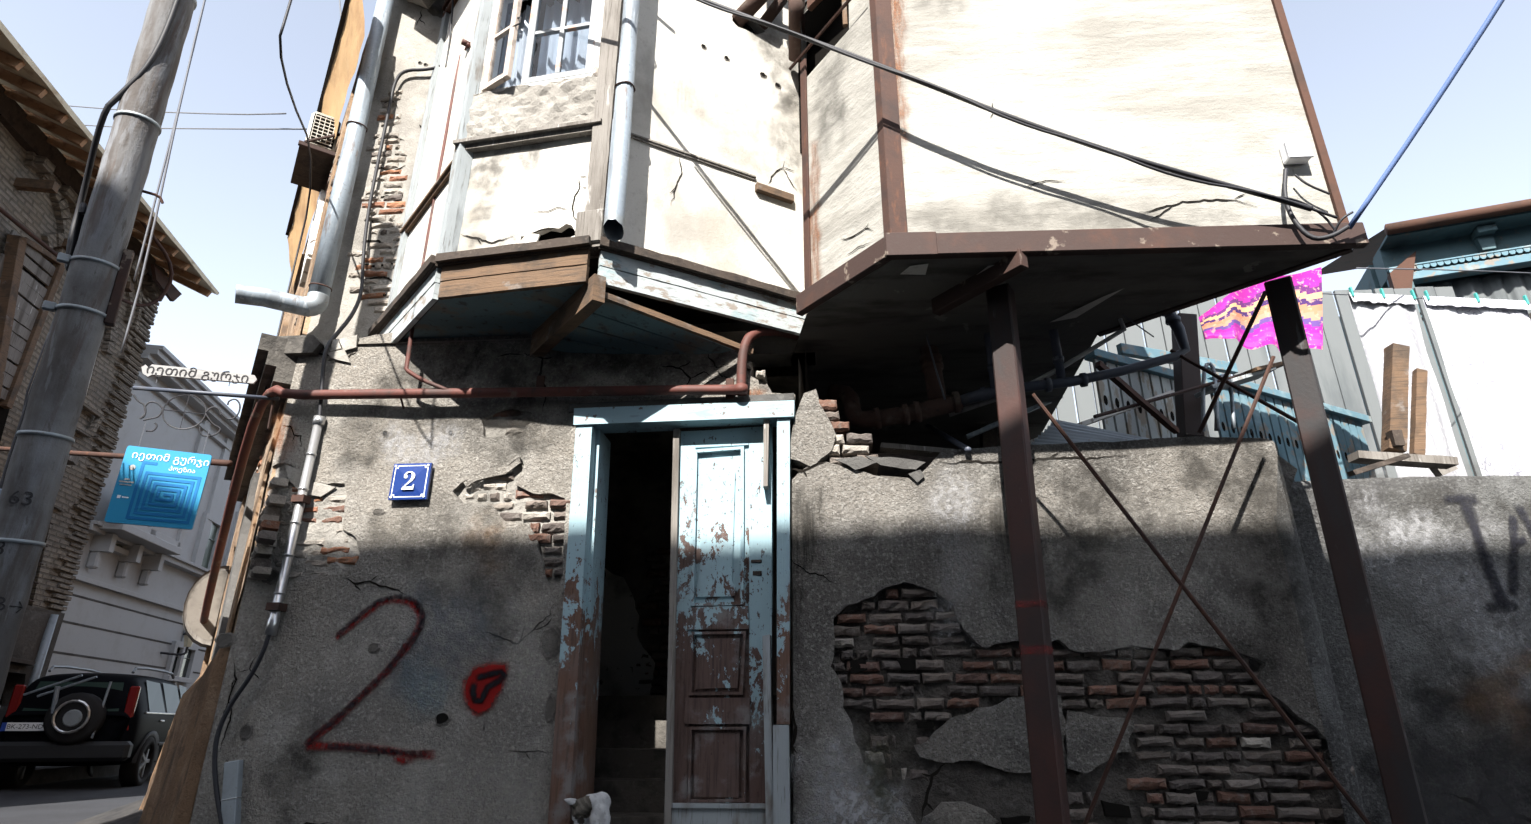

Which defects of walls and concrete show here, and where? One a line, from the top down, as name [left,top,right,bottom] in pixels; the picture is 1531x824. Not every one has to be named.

spalling [347,90,408,313]
crack [461,176,587,244]
peeling [519,227,558,243]
crack [1137,194,1256,220]
crack [662,354,736,385]
spalling [247,454,360,585]
spalling [455,457,571,589]
spalling [831,583,1036,824]
spalling [1052,641,1356,824]